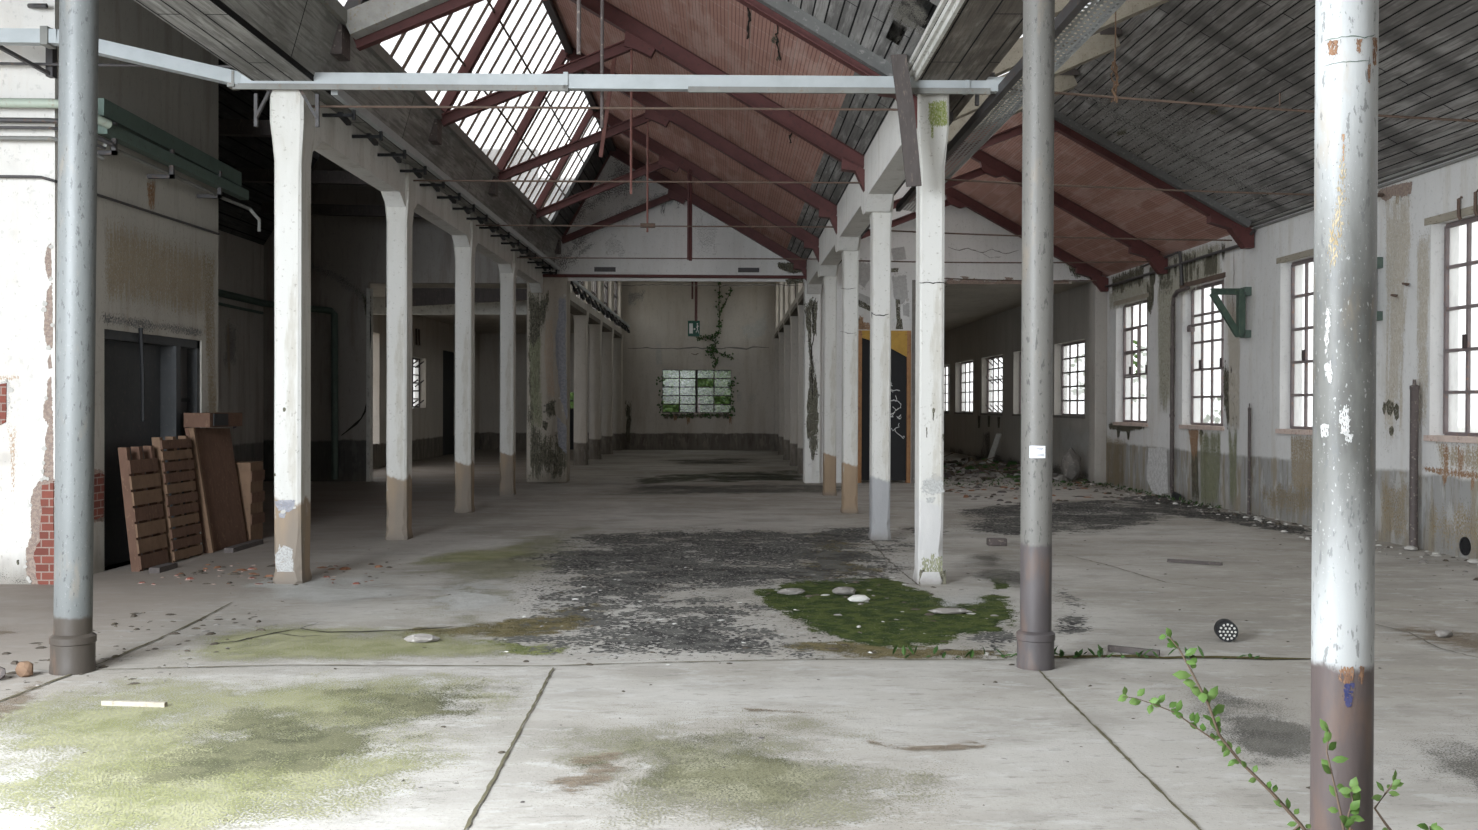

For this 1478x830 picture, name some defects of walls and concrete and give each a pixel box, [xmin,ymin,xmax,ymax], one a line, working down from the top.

rust [1327,37,1377,82]
peeling [1324,308,1333,384]
flaking render [0,379,14,425]
spalling [23,244,55,585]
peeling [1320,405,1353,443]
damp [1262,434,1312,516]
rust [1425,442,1478,490]